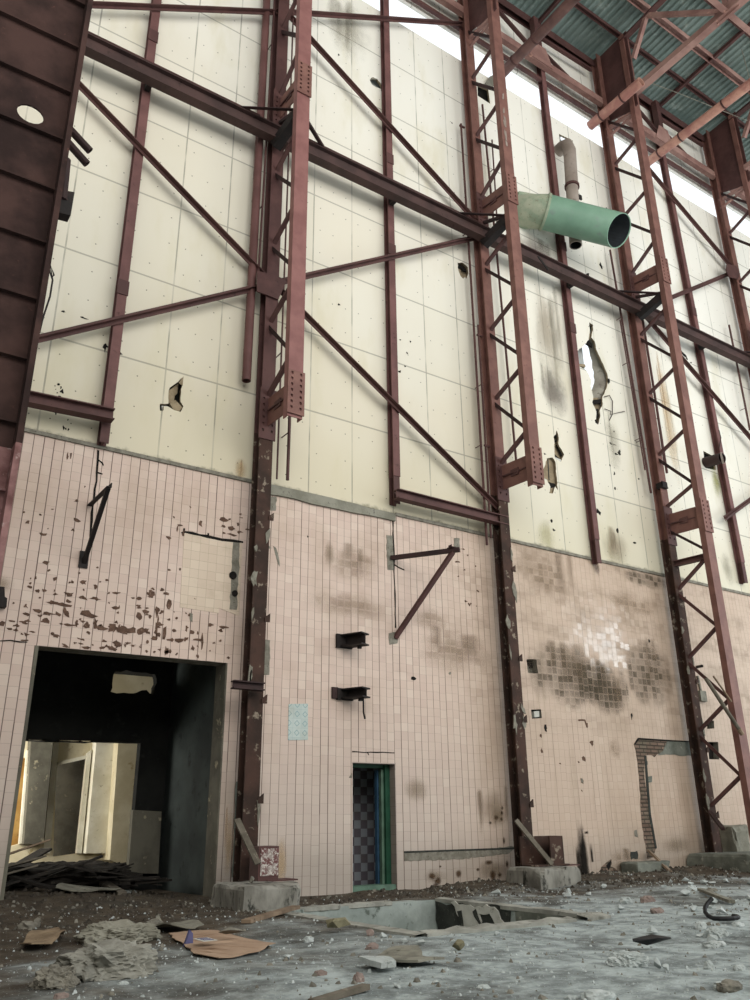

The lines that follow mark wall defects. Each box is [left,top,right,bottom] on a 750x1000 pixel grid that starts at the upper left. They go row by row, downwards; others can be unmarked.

spalling [0,561,229,658]
peeling [220,513,249,610]
flaking render [630,738,691,860]
damp [577,832,593,875]